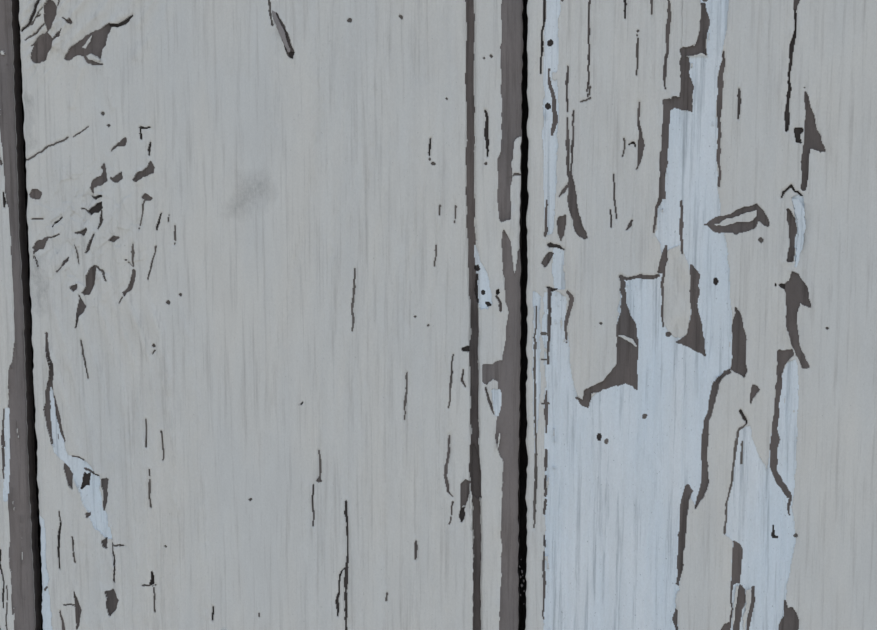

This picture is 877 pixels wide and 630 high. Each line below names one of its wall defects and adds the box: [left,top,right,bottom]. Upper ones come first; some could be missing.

peeling [64,15,133,65]
peeling [0,0,82,630]
peeling [43,332,119,616]
peeling [70,265,96,296]
peeling [82,161,155,222]
peeling [122,244,136,296]
crack [335,500,349,630]
peeling [474,0,523,630]
peeling [532,0,770,630]
peeling [721,87,826,630]